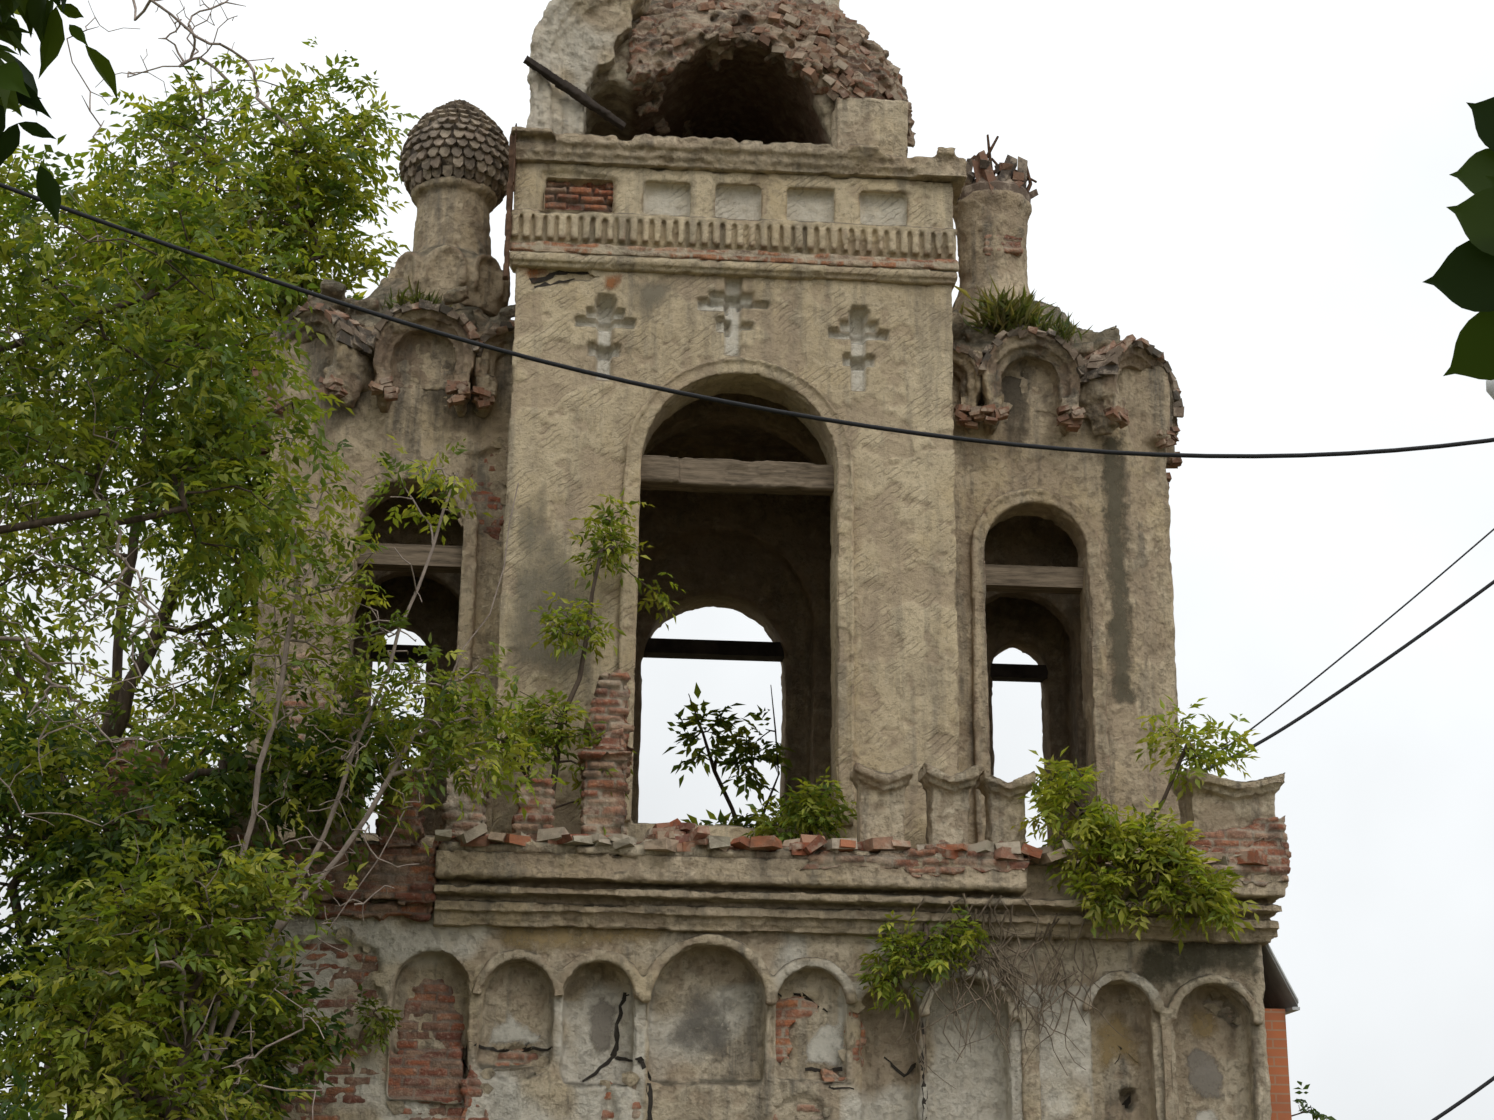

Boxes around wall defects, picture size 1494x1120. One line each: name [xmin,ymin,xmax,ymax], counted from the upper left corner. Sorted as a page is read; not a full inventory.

spalling [458,436,507,540]
flaking render [800,849,1035,878]
flaking render [1188,836,1291,887]
spalling [249,925,550,1120]
crack [462,1035,553,1072]
crack [582,992,653,1120]
spalling [776,991,829,1066]
spalling [820,1001,866,1082]